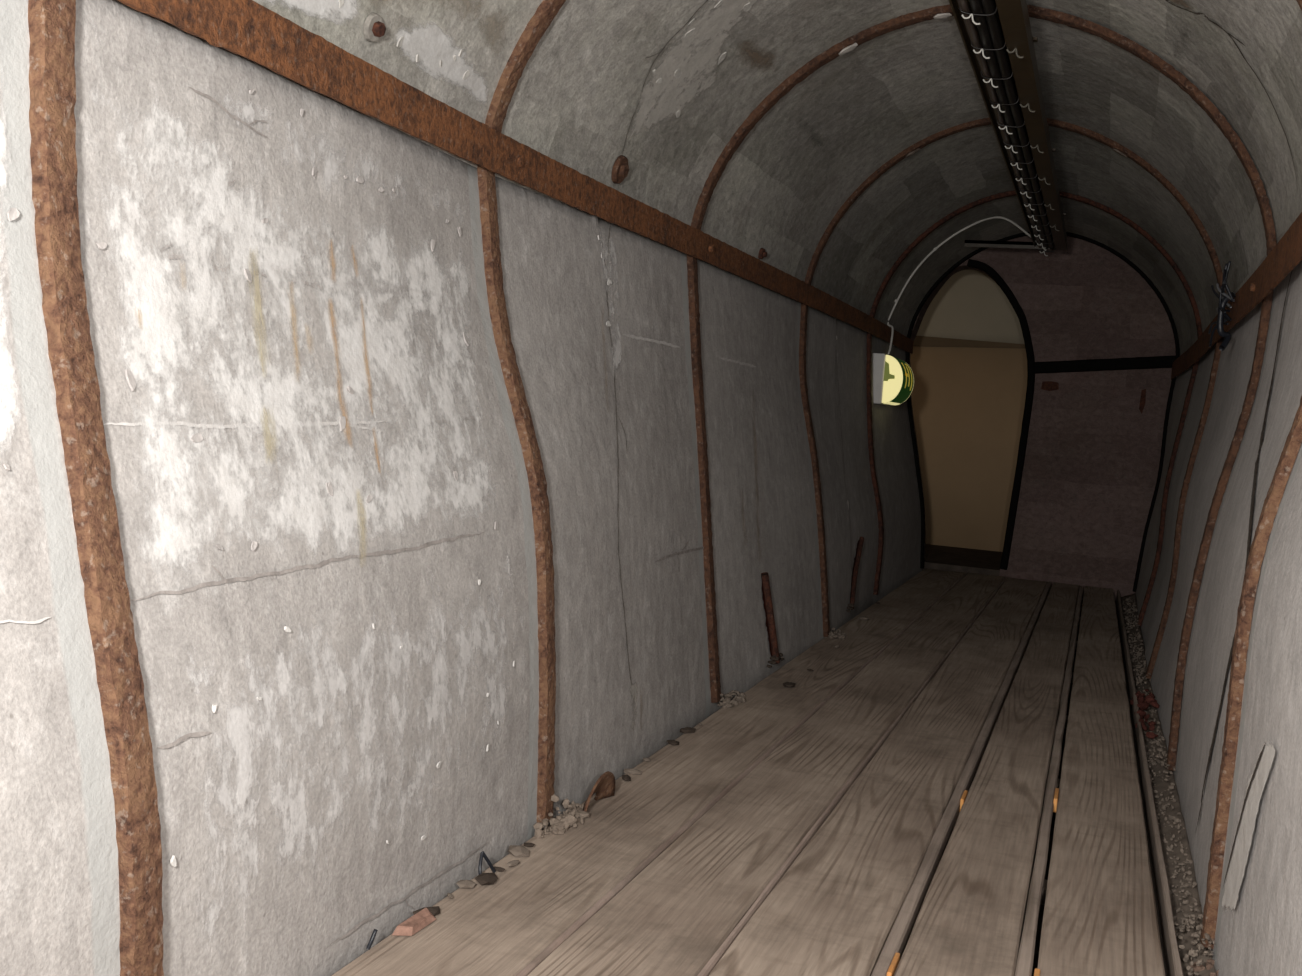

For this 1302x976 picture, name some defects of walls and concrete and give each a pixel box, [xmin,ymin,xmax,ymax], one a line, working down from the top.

crack [130,532,484,601]